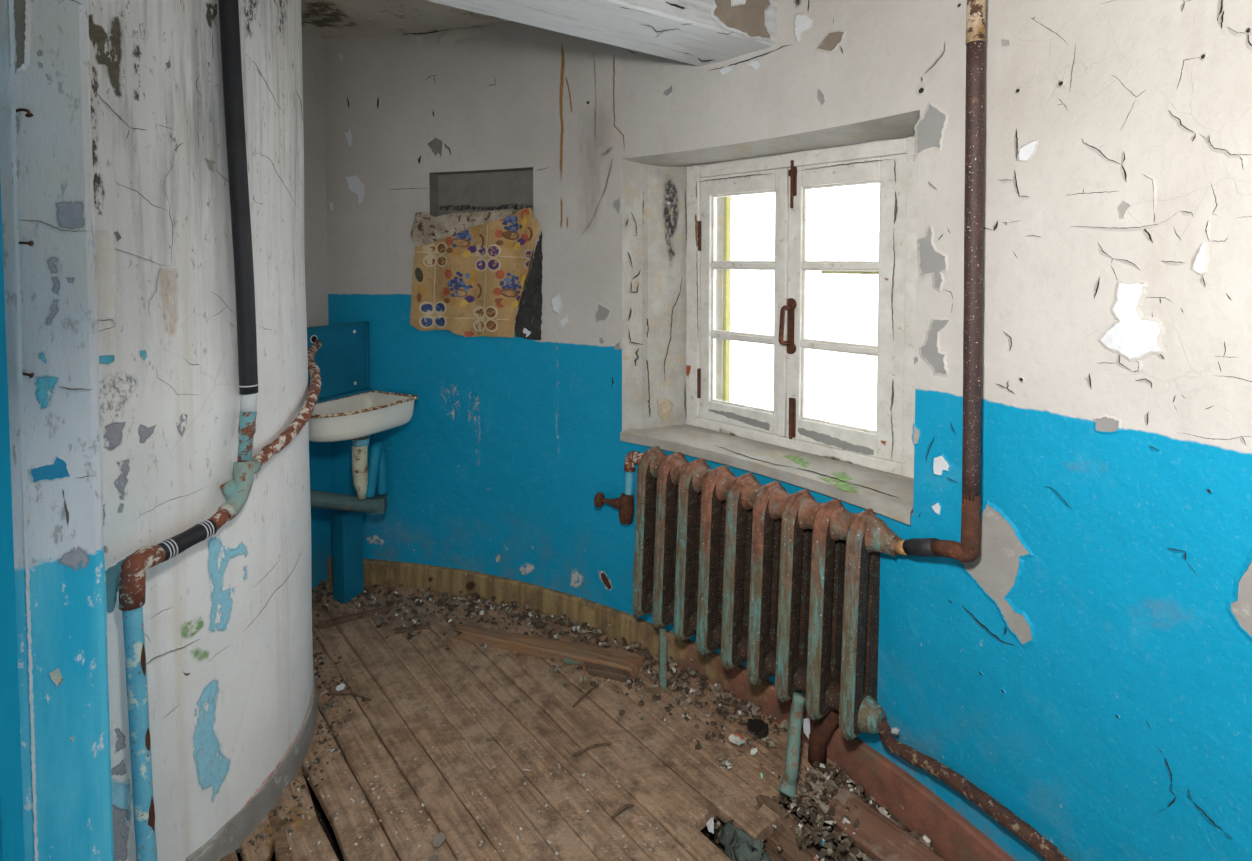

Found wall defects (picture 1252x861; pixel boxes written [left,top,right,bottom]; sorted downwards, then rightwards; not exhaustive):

water stain [301,2,356,27]
peeling [711,0,772,42]
crack [1180,0,1252,52]
rust [560,49,572,171]
crack [611,173,771,419]
crack [805,159,897,341]
peeling [914,317,952,377]
peeling [1097,279,1165,362]
crack [1070,75,1252,318]
crack [1083,343,1251,452]
peeling [958,500,1036,648]
peeling [1225,548,1252,643]